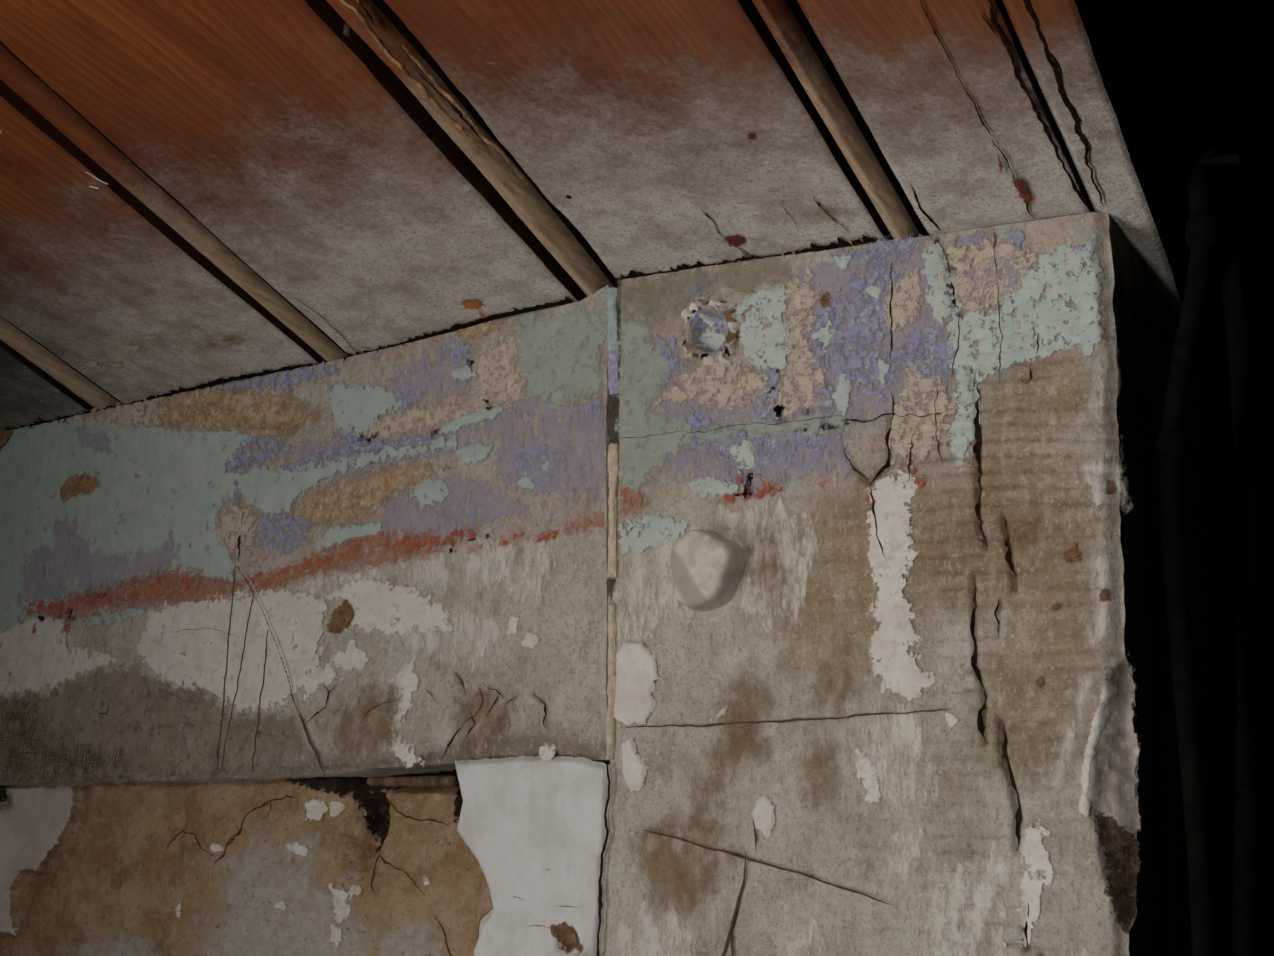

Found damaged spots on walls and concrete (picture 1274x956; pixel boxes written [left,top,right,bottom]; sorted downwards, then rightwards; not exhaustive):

crack [920,0,1035,219]
crack [981,0,1104,208]
crack [6,296,574,430]
peeling [0,230,1141,956]
crack [495,184,1039,956]
leakage [0,665,301,792]
crack [307,685,394,723]
crack [426,674,546,757]
crack [166,795,296,863]
crack [370,800,451,956]
crack [1024,903,1044,956]